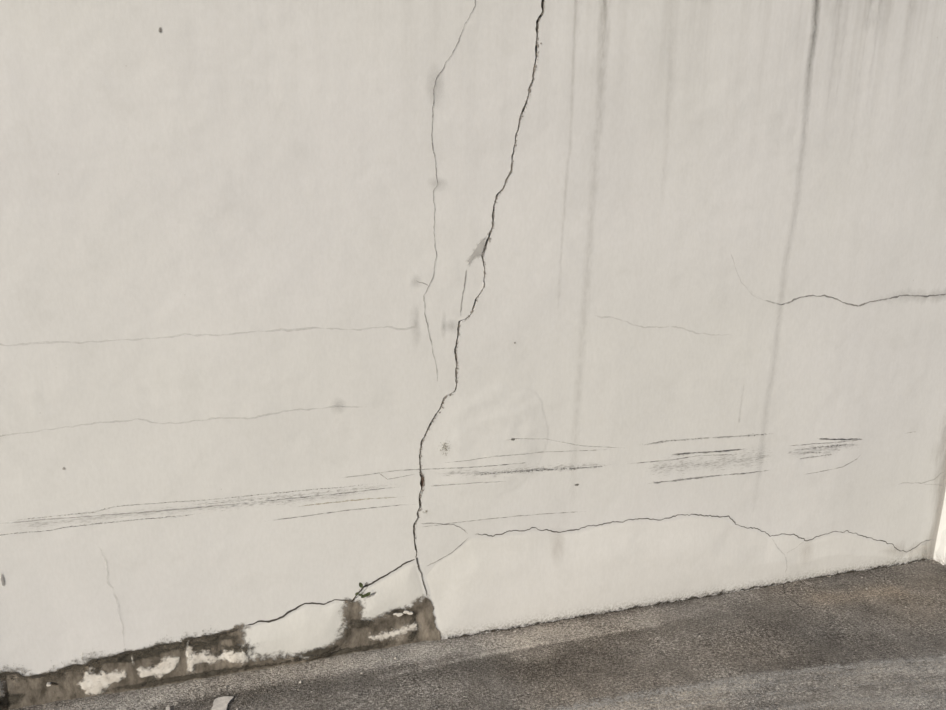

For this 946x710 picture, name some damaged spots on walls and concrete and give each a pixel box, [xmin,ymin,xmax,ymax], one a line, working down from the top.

crack [248,0,945,625]
spalling [0,597,442,710]